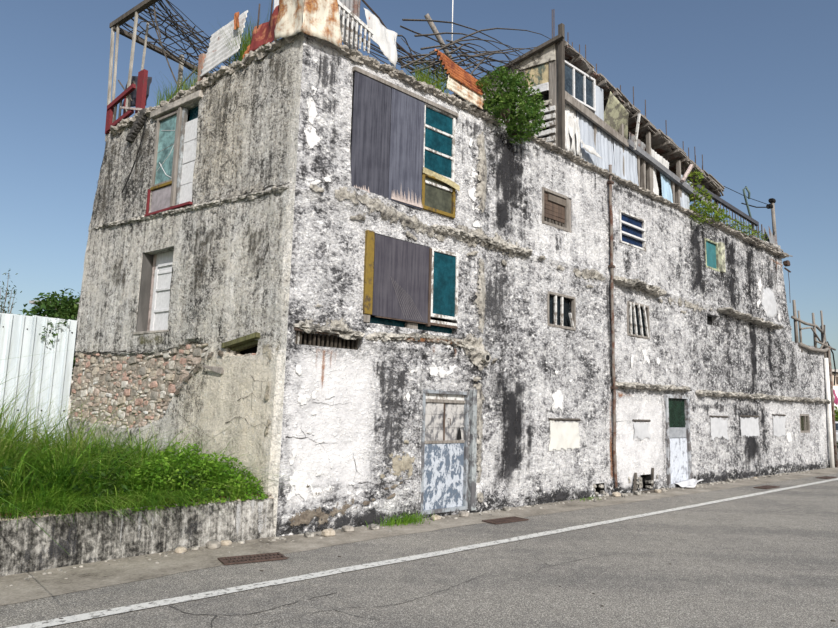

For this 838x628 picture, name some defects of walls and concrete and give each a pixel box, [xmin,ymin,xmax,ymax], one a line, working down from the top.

leakage [455,117,486,138]
leakage [495,133,523,232]
spalling [69,342,224,428]
peeling [286,446,376,527]
spalling [380,440,416,500]
leakage [496,374,532,481]